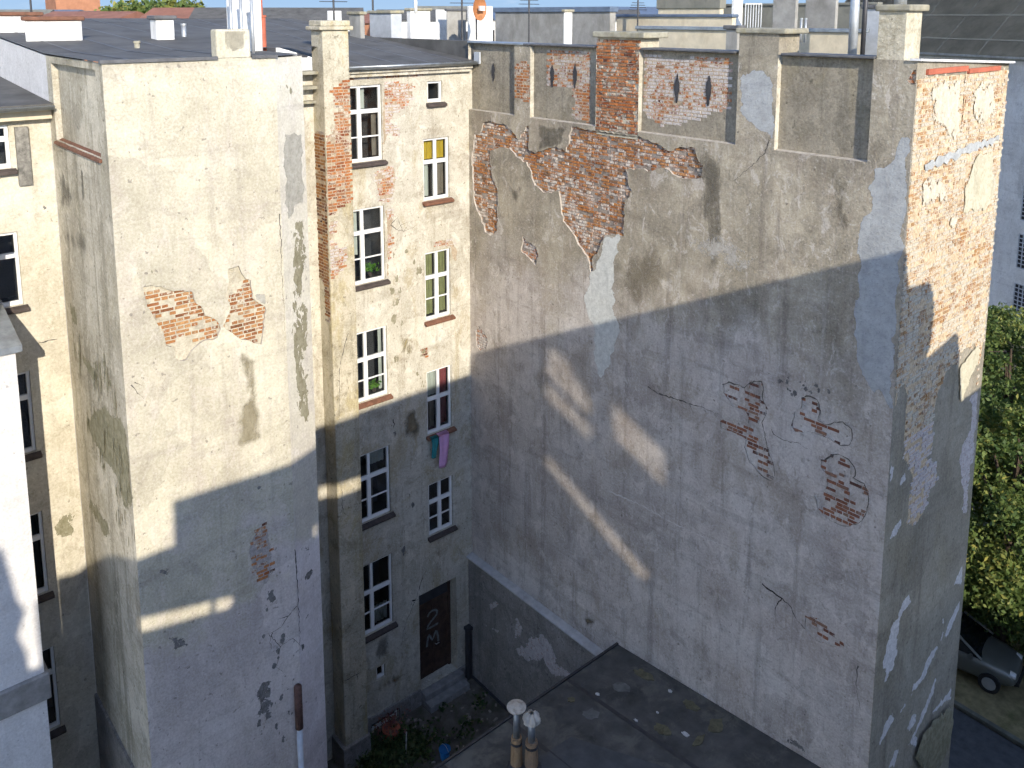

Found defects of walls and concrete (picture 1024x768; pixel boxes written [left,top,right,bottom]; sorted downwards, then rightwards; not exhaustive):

flaking render [471,50,703,278]
flaking render [643,54,733,127]
flaking render [143,266,266,361]
flaking render [291,74,426,422]
flaking render [895,67,1009,514]
crack [648,386,718,414]
flaking render [720,380,776,481]
flaking render [778,374,869,526]
flaking render [249,522,277,612]
crack [261,549,300,716]
peeling [879,595,960,768]